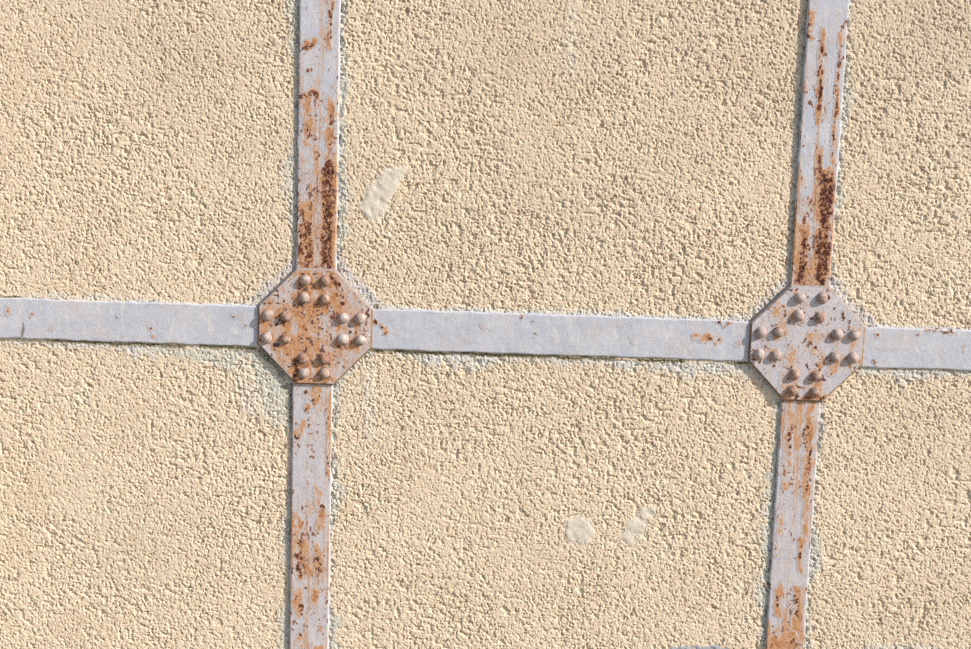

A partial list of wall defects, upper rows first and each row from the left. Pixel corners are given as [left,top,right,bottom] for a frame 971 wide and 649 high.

rust [259,0,390,649]
rust [691,0,881,649]